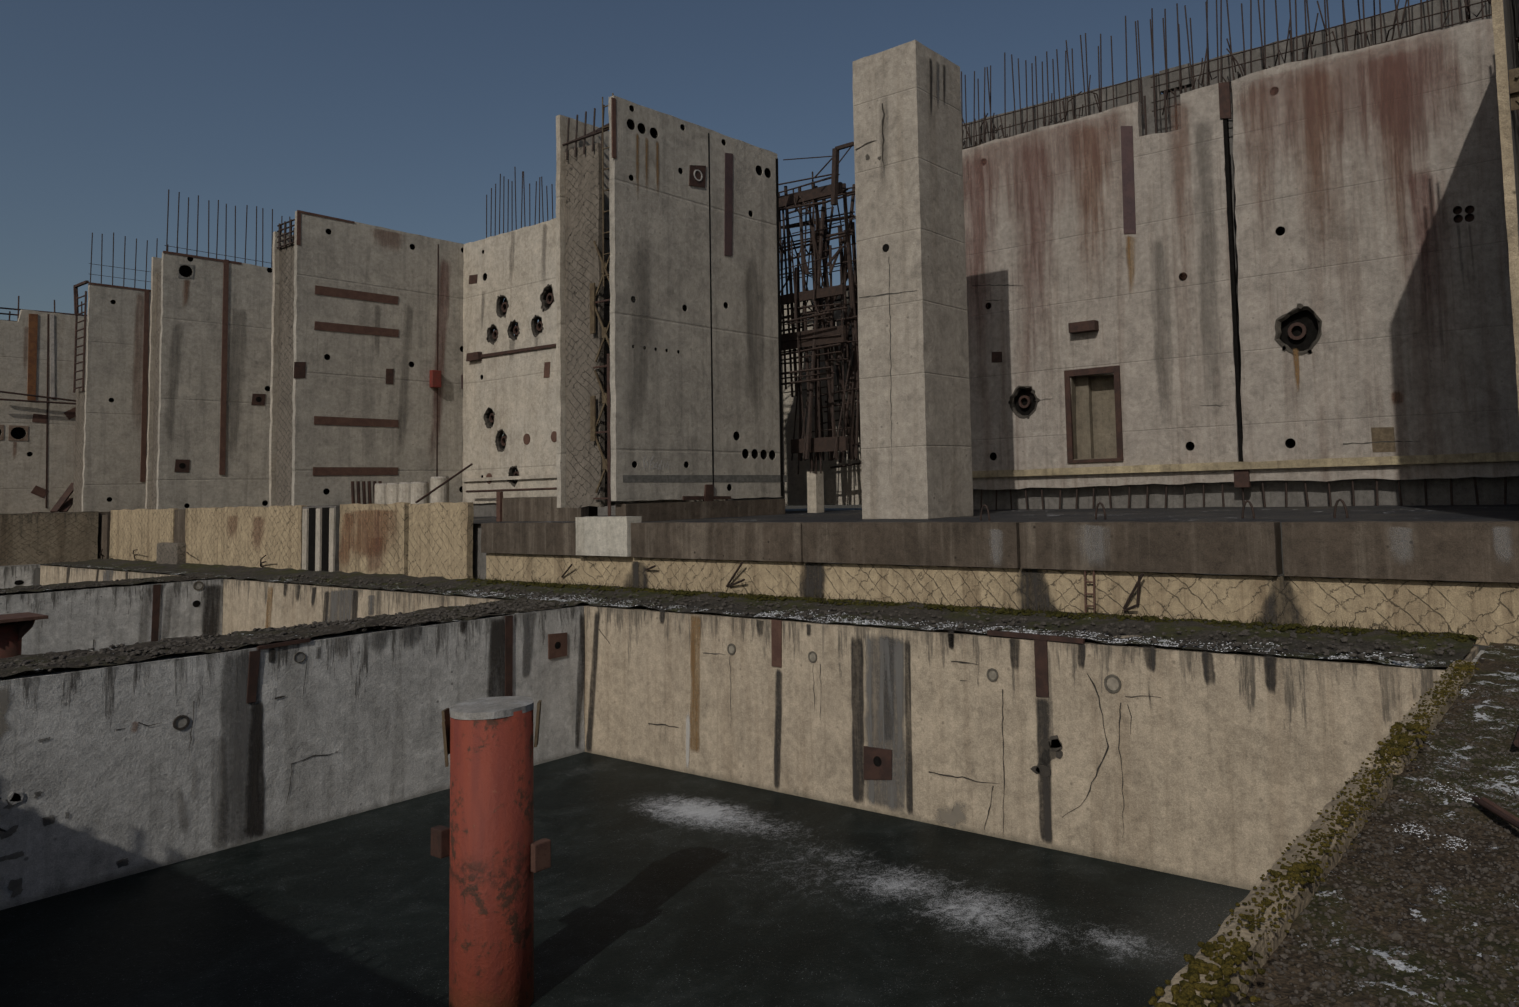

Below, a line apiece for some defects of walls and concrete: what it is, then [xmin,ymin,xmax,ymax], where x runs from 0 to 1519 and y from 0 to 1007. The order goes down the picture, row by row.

rust [1410,177,1436,265]